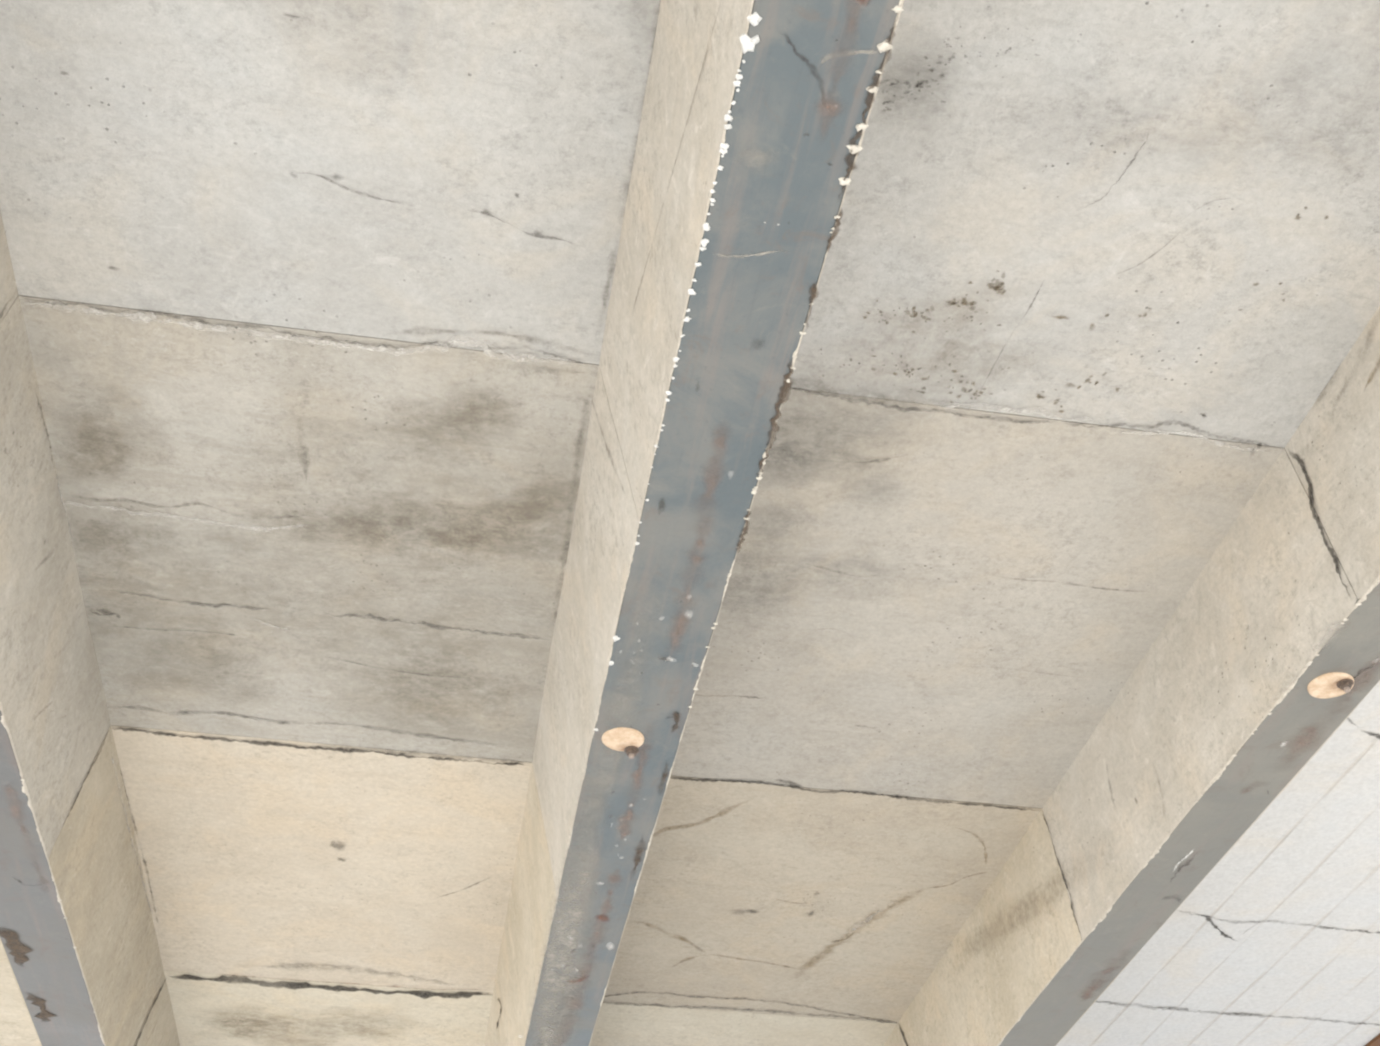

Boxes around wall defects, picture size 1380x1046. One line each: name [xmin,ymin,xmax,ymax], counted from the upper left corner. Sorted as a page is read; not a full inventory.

corrosion [842,26,896,190]
corrosion [827,210,843,250]
corrosion [806,285,818,326]
corrosion [759,365,793,470]
crack [792,388,1040,423]
crack [1295,455,1347,588]
crack [668,777,1079,930]
crack [1204,916,1254,940]